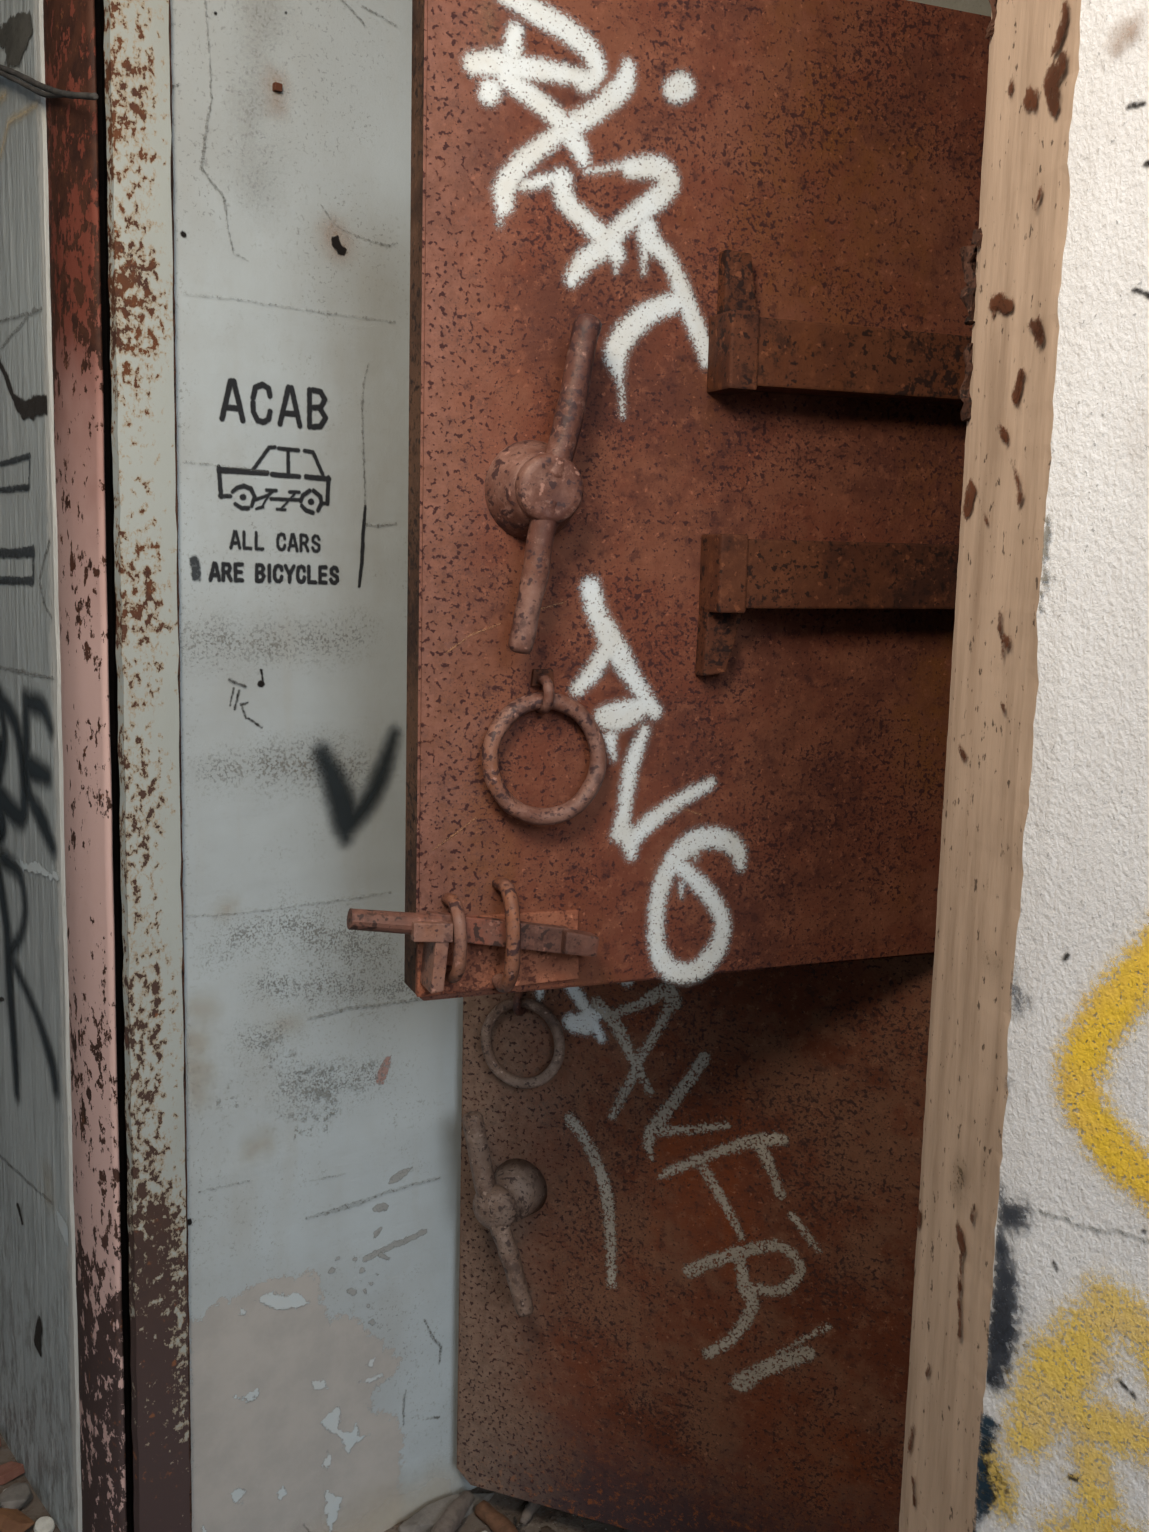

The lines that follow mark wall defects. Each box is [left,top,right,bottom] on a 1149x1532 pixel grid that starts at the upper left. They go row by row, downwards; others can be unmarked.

rust [989,293,1013,318]
rust [1012,369,1024,405]
rust [963,480,988,524]
rust [1014,471,1023,505]
rust [997,612,1010,657]
rust [955,1206,976,1338]
peeling [189,1203,444,1532]